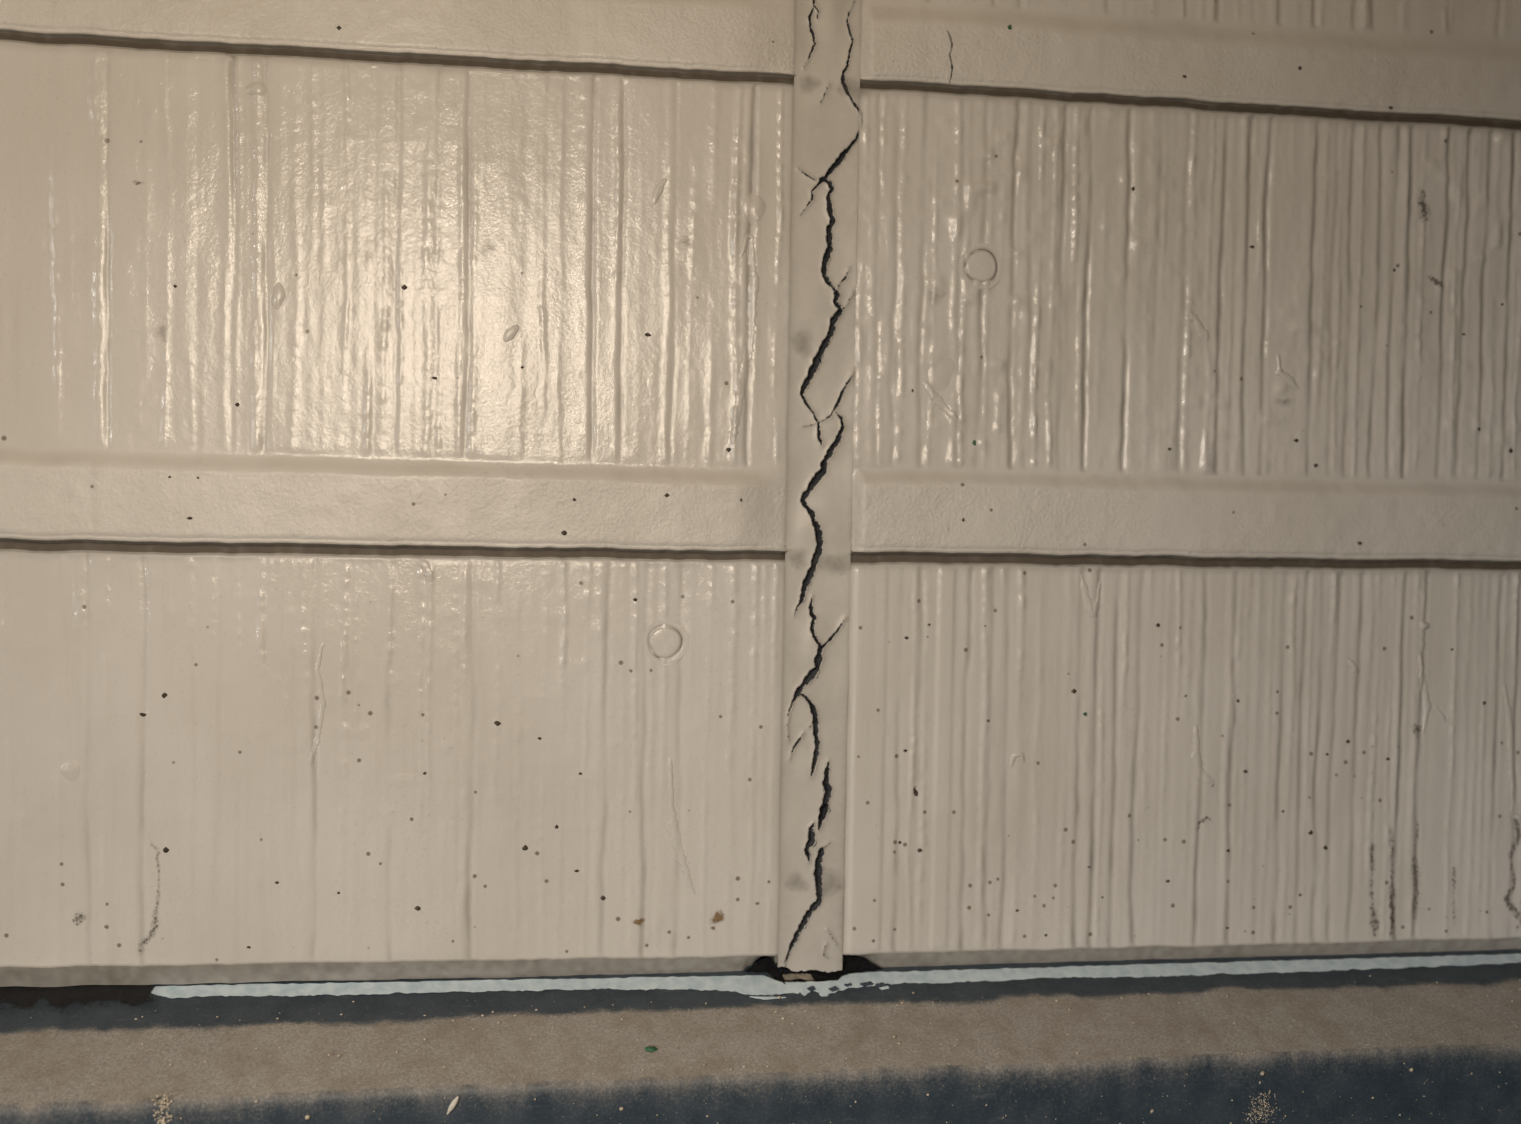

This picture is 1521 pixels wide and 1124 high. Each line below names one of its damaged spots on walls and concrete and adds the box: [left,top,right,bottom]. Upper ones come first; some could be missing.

crack [785,0,863,967]